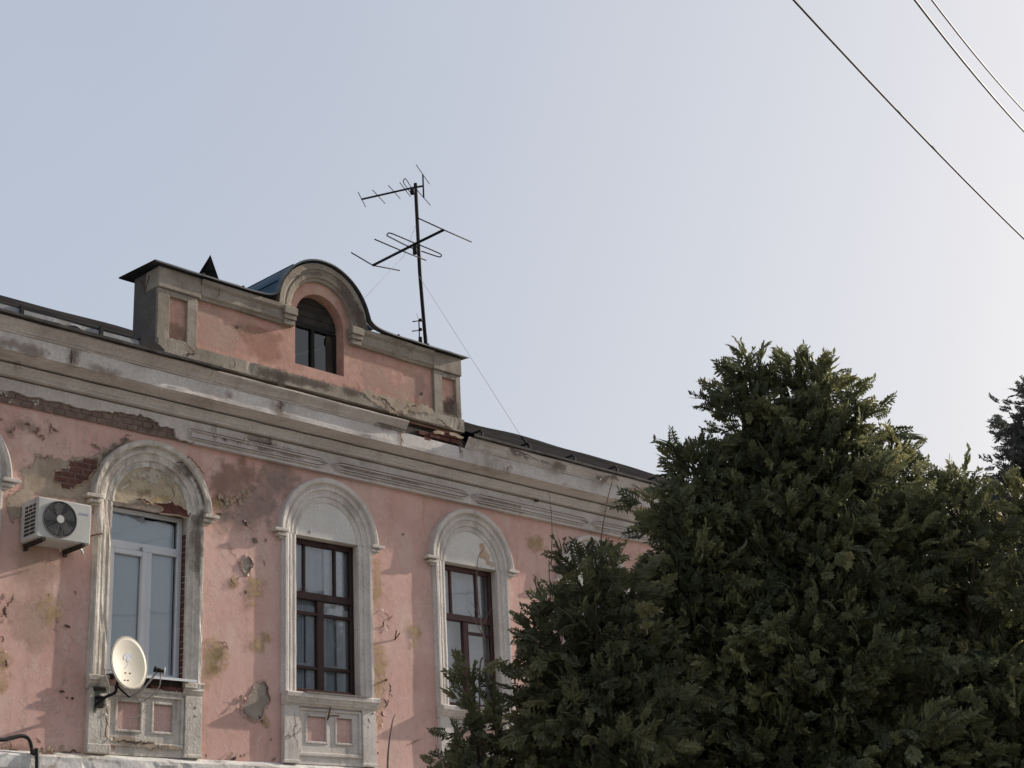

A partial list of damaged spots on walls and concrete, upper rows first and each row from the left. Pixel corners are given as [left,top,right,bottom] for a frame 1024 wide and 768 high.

spalling [363,388,467,449]
peeling [0,391,193,524]
spalling [228,545,265,577]
spalling [236,680,271,727]